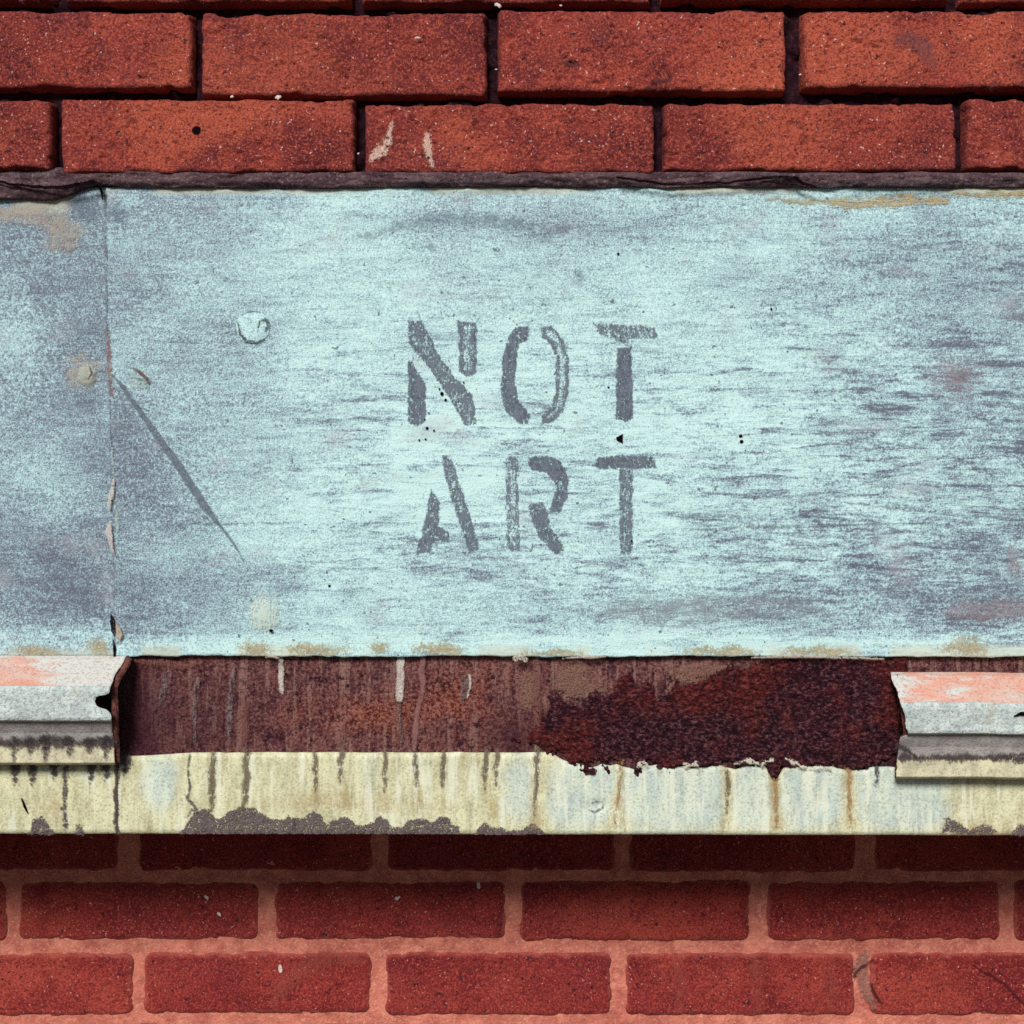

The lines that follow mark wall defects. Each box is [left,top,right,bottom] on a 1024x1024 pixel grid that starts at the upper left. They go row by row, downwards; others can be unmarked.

rust [95,636,1024,828]
water stain [0,733,133,835]
water stain [207,750,216,811]
water stain [241,747,251,809]
water stain [336,748,344,782]